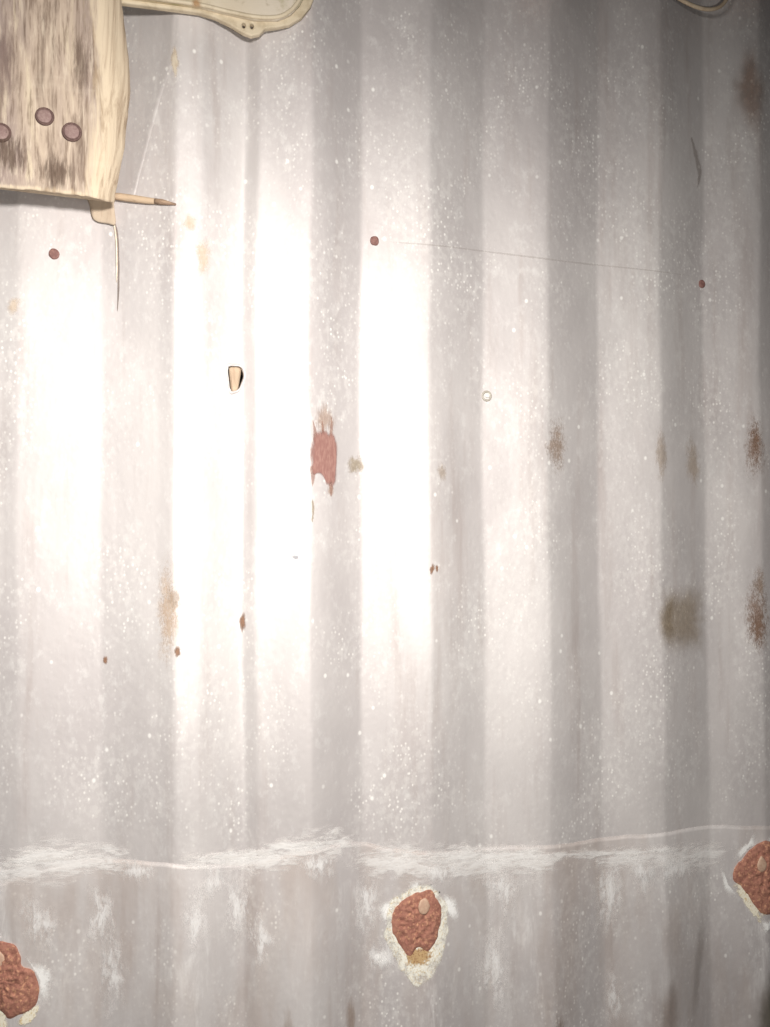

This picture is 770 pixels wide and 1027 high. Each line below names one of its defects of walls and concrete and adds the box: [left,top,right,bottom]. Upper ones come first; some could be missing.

corrosion [311,432,337,484]
corrosion [749,601,764,639]
water stain [0,843,151,883]
corrosion [722,838,770,933]
water stain [90,891,113,936]
corrosion [371,883,458,987]
corrosion [0,936,51,1027]